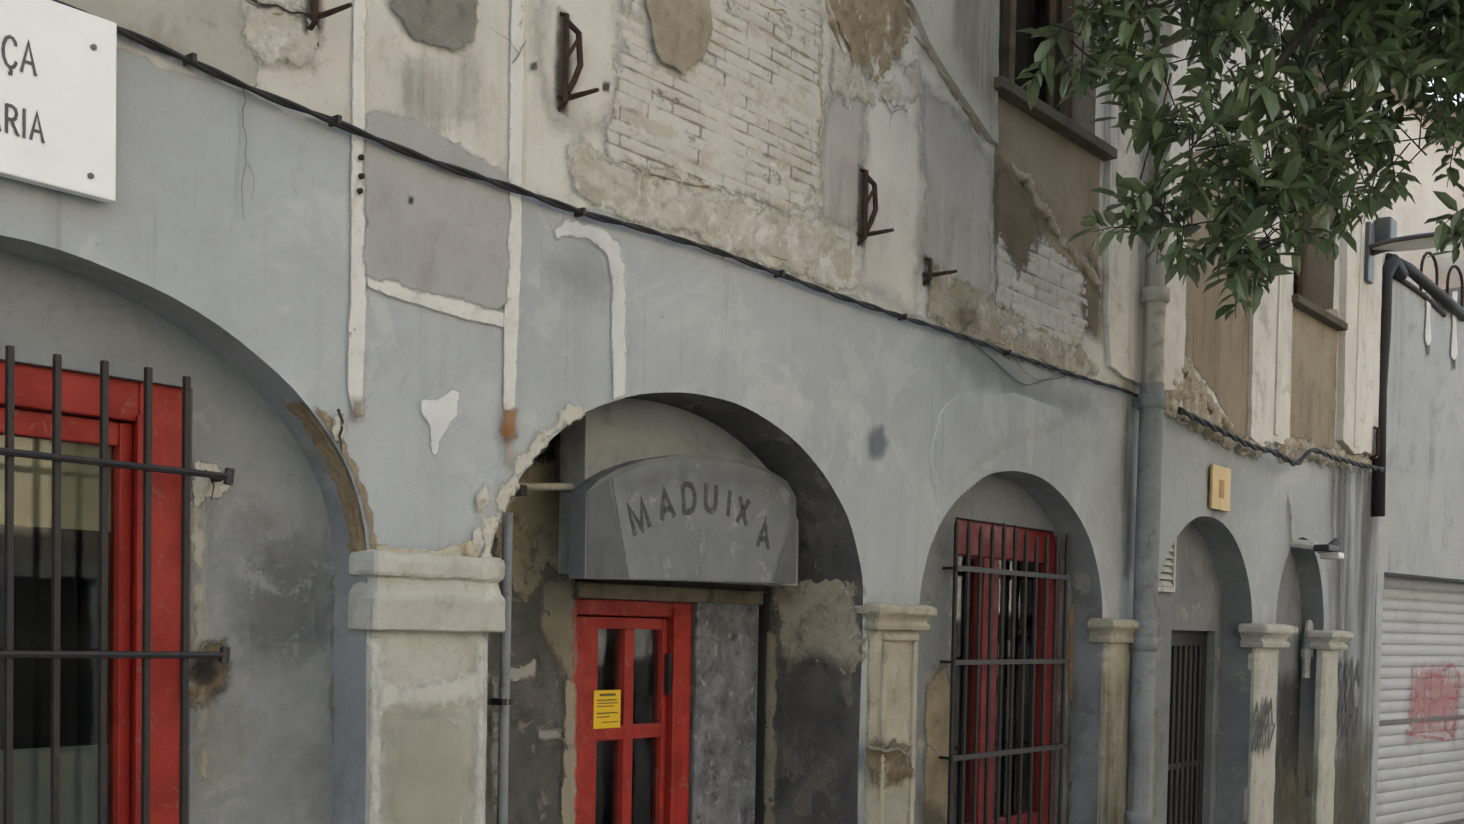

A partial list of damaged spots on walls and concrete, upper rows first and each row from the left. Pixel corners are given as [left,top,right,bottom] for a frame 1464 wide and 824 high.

flaking render [568,0,985,292]
flaking render [927,157,1102,379]
peeling [421,389,460,455]
corrosion [501,409,517,442]
spalling [1164,357,1372,472]
flaking render [286,402,585,824]
flaking render [763,579,867,824]